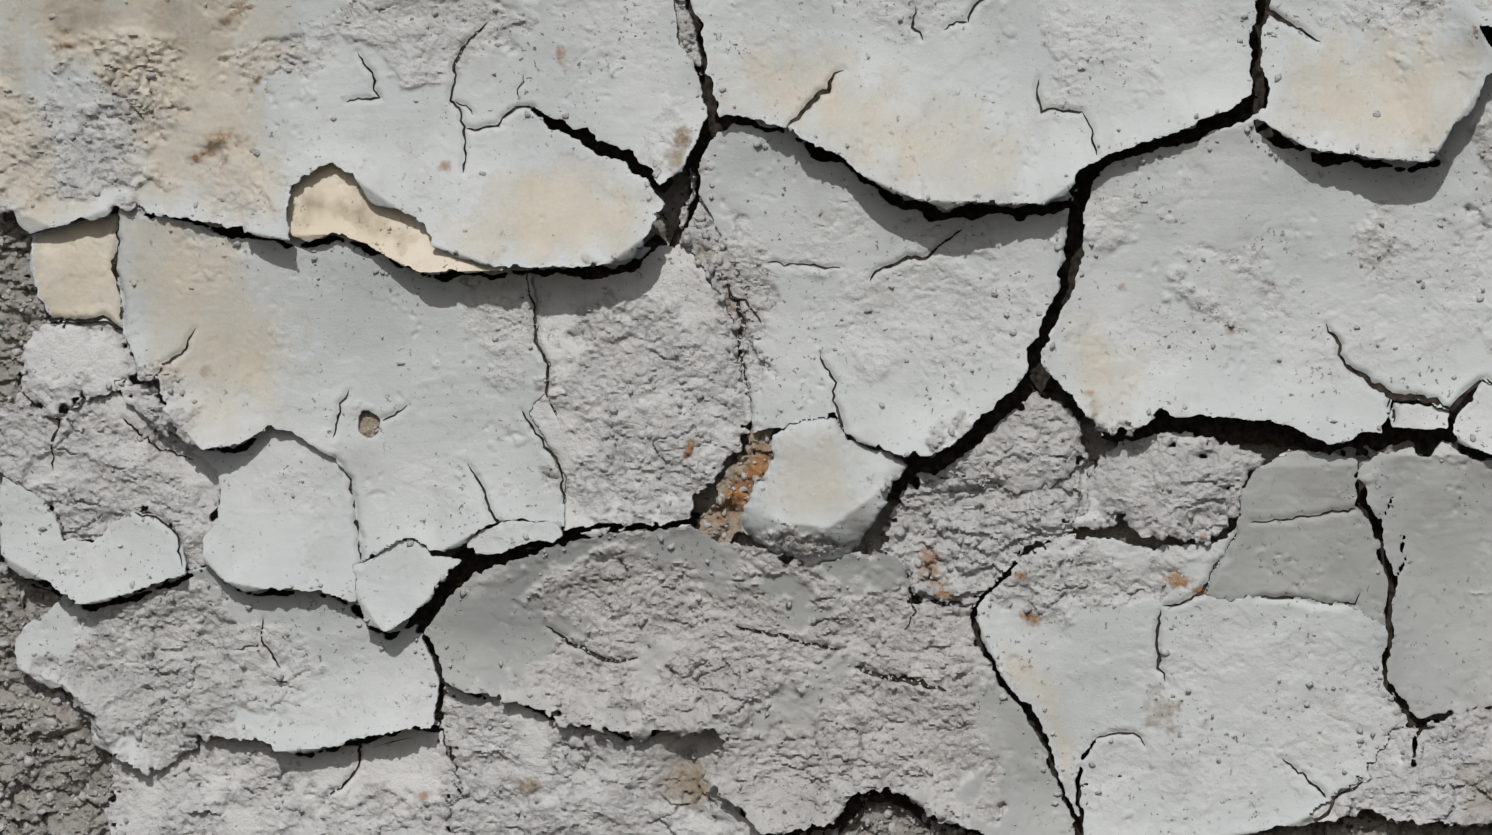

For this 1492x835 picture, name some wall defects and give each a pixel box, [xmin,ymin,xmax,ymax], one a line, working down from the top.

peeling [0,0,708,405]
crack [145,0,1438,502]
crack [30,512,194,612]
crack [123,418,257,460]
peeling [0,204,565,835]
crack [296,512,701,795]
corrosion [716,454,771,511]
crack [736,625,947,691]
crack [740,787,984,835]
peeling [424,0,1492,835]
crack [904,551,1145,835]
crack [1101,324,1492,762]